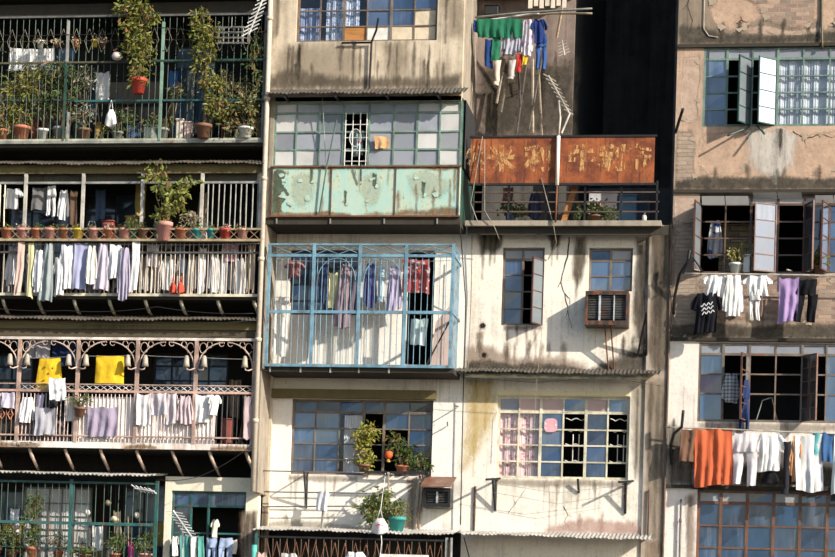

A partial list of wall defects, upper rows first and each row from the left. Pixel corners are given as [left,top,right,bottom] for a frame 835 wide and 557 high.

flaking render [708,0,835,36]
leakage [270,44,459,90]
peeling [272,169,315,213]
peeling [364,173,379,203]
leakage [479,235,502,261]
crack [557,237,572,329]
leakage [573,238,586,285]
leakage [595,229,835,370]
leakage [467,333,583,454]